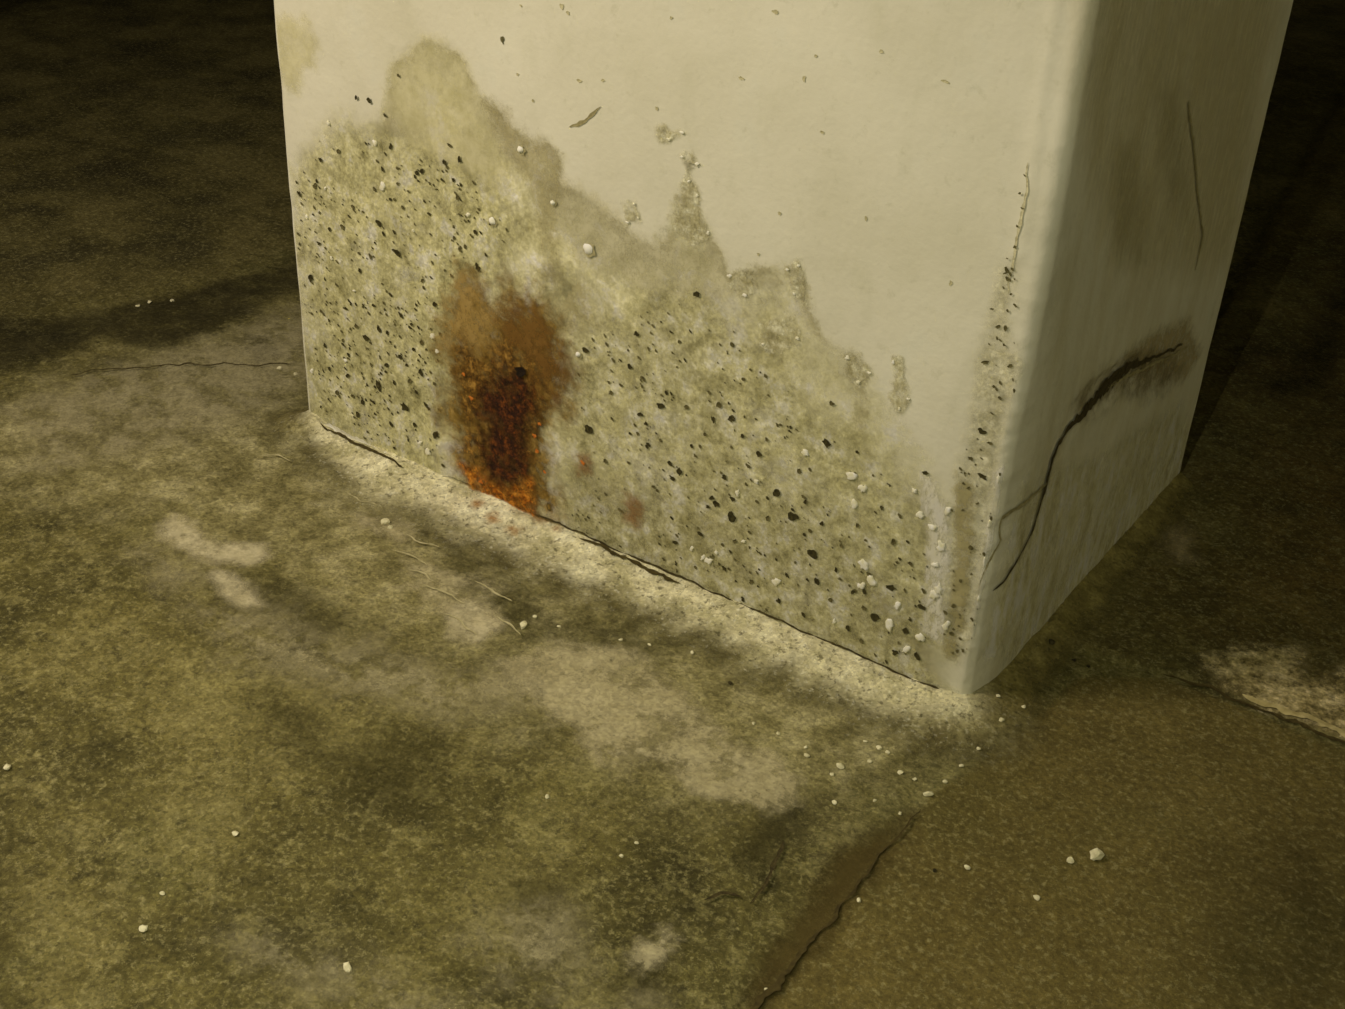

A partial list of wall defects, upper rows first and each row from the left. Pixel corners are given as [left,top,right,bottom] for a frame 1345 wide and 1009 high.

spalling [295,120,512,470]
corrosion [435,269,575,523]
peeling [673,154,710,245]
spalling [568,246,1018,683]
crack [979,324,1197,591]
water stain [505,647,796,904]
crack [750,809,921,1009]